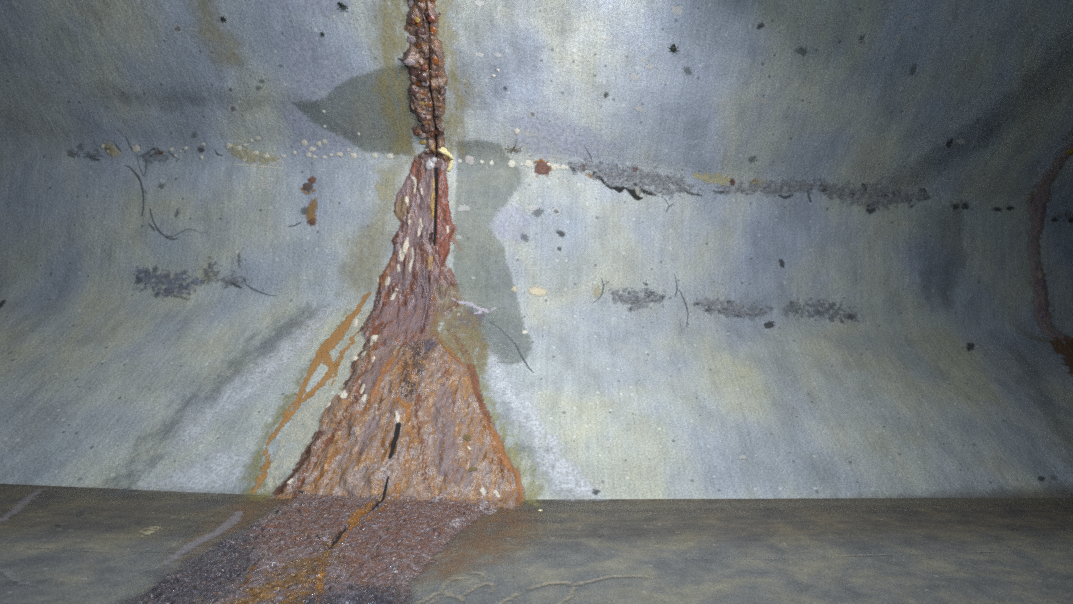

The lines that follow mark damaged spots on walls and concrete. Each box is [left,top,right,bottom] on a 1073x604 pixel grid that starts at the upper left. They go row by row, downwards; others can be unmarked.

crack [425,0,438,246]
corrosion [534,159,552,177]
spalling [568,158,931,214]
corrosion [128,0,524,604]
corrosion [1049,335,1073,376]
crack [328,423,401,550]